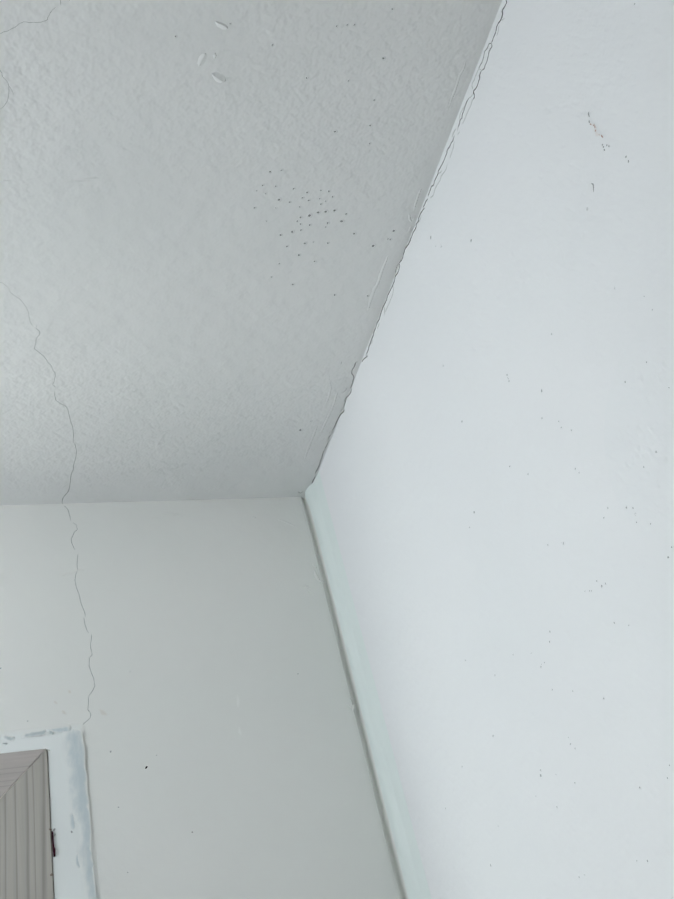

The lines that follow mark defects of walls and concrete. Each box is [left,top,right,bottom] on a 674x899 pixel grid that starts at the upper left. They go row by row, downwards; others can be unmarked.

crack [298,0,507,494]